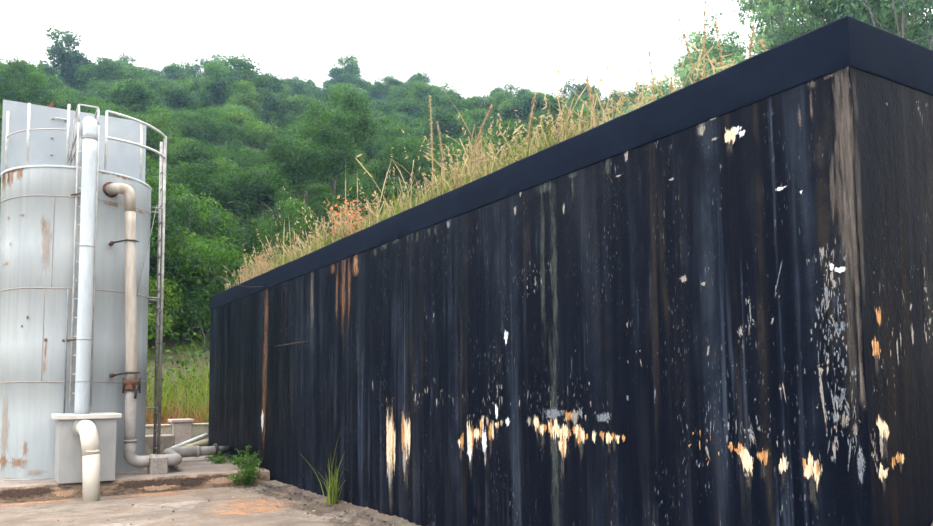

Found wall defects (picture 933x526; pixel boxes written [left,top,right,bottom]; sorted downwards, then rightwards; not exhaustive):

peeling [698,117,745,151]
rust [2,168,23,188]
rust [42,222,50,258]
water stain [825,72,855,378]
rust [331,258,358,316]
peeling [802,161,904,501]
peeling [872,269,933,371]
rust [0,408,39,474]
peeling [379,397,411,504]
peeling [458,383,528,469]
peeling [528,383,625,474]
peeling [686,412,790,485]